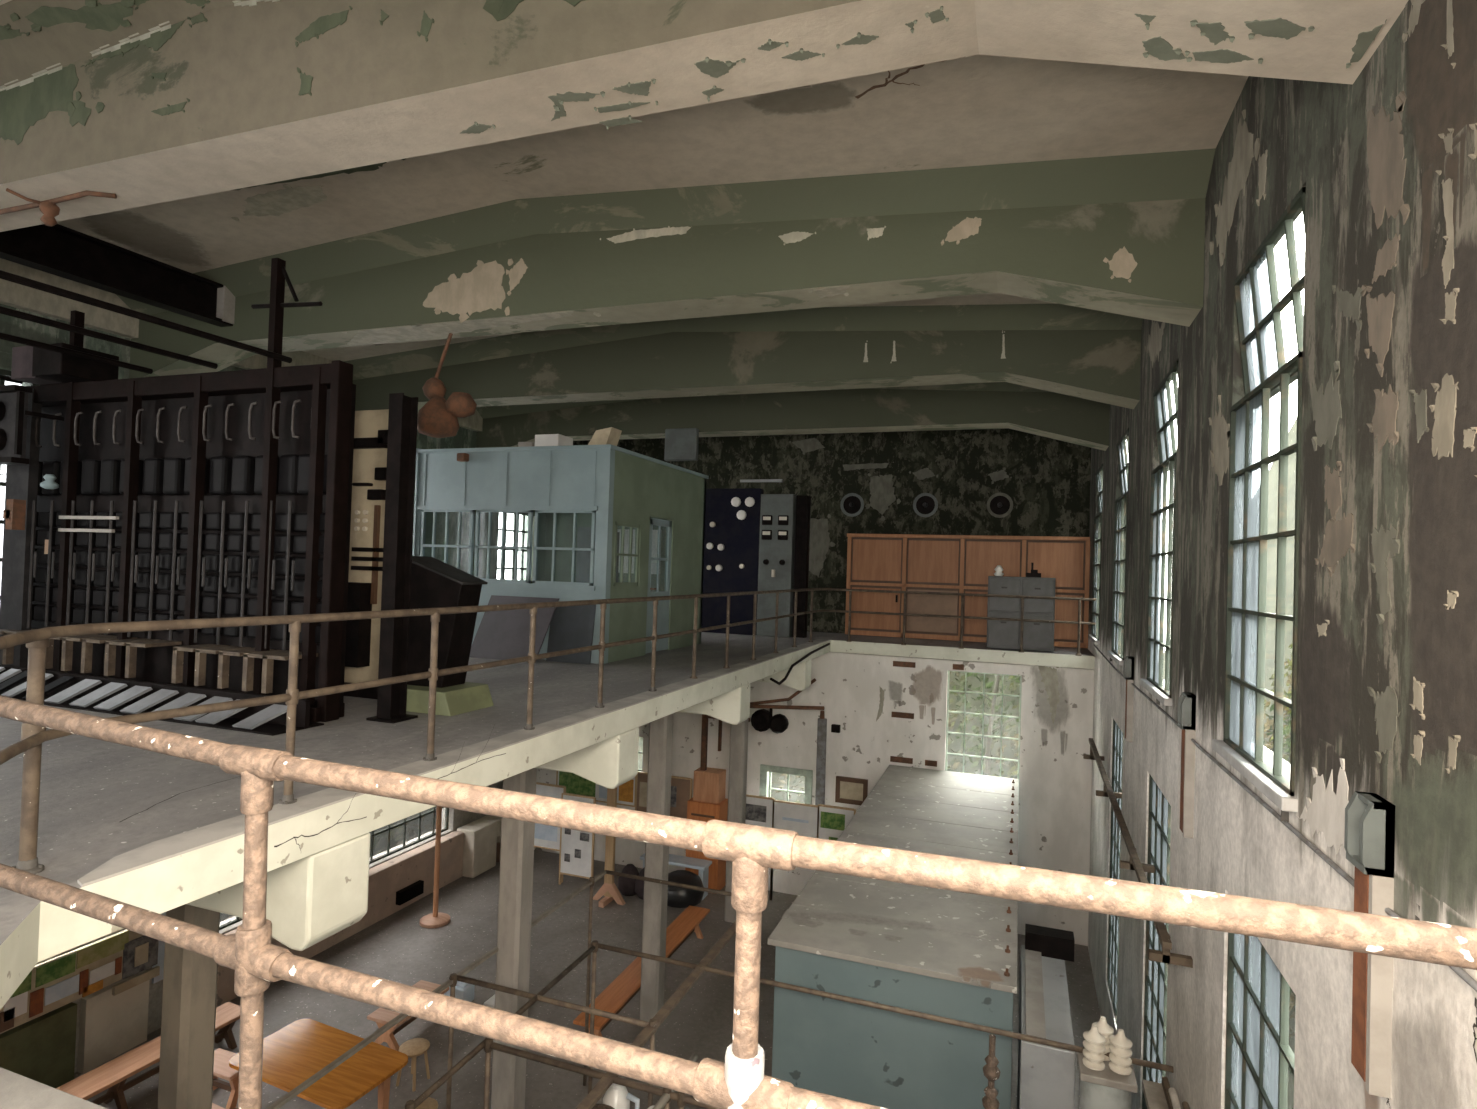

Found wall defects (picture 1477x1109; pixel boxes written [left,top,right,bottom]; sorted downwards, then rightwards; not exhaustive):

peeling [0,0,210,145]
peeling [694,32,879,102]
damp [741,79,862,118]
crack [855,60,947,99]
peeling [1135,14,1315,64]
peeling [1210,110,1268,266]
peeling [337,258,575,348]
peeling [1332,91,1477,460]
damp [1387,0,1477,928]
damp [1298,596,1357,794]
peeling [1367,677,1425,765]
crack [1469,997,1477,1062]